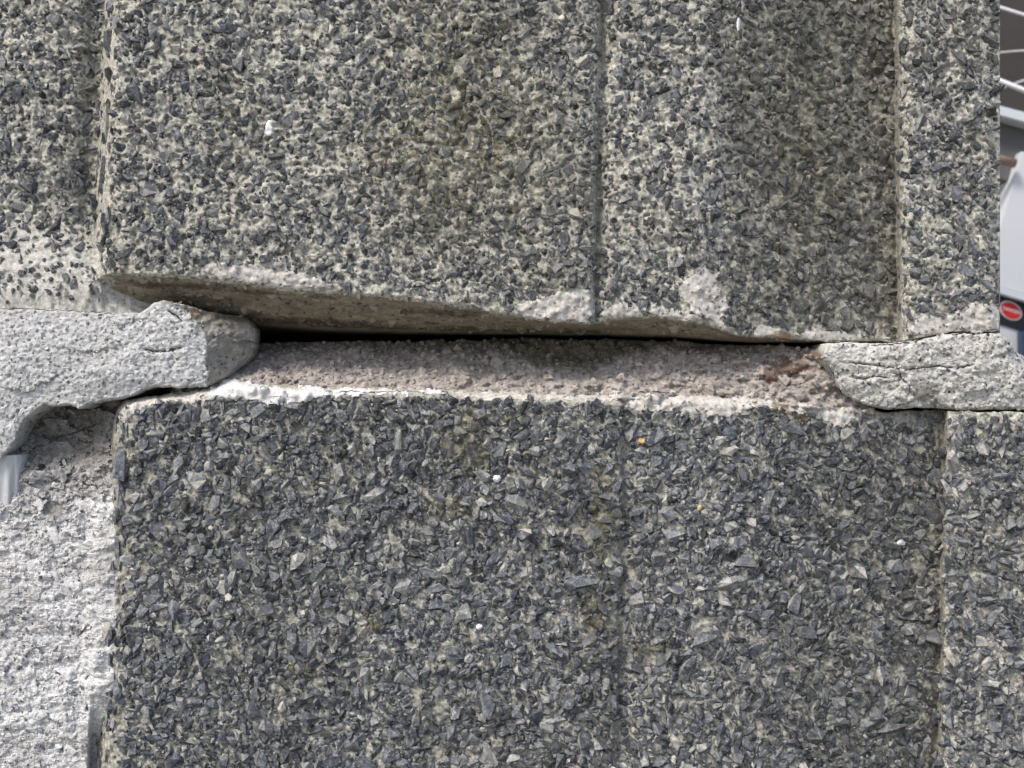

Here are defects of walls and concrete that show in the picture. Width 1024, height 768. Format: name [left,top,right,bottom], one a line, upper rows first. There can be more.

spalling [0,261,891,768]